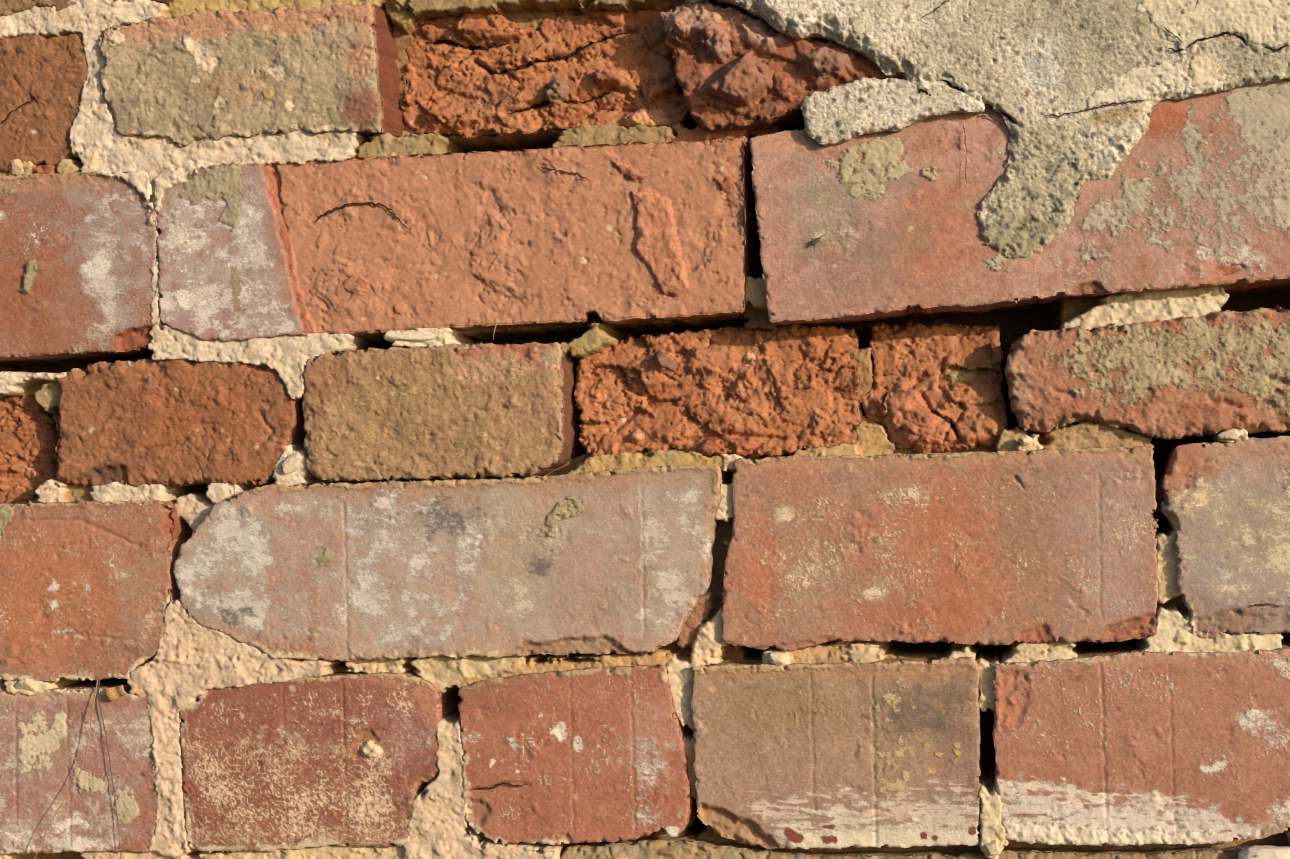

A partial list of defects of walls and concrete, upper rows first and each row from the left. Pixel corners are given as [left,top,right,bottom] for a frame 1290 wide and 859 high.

crack [1164,0,1286,52]
water stain [0,169,301,353]
spalling [266,0,1290,457]
spalling [0,395,56,503]
water stain [0,477,712,667]
water stain [0,698,152,854]